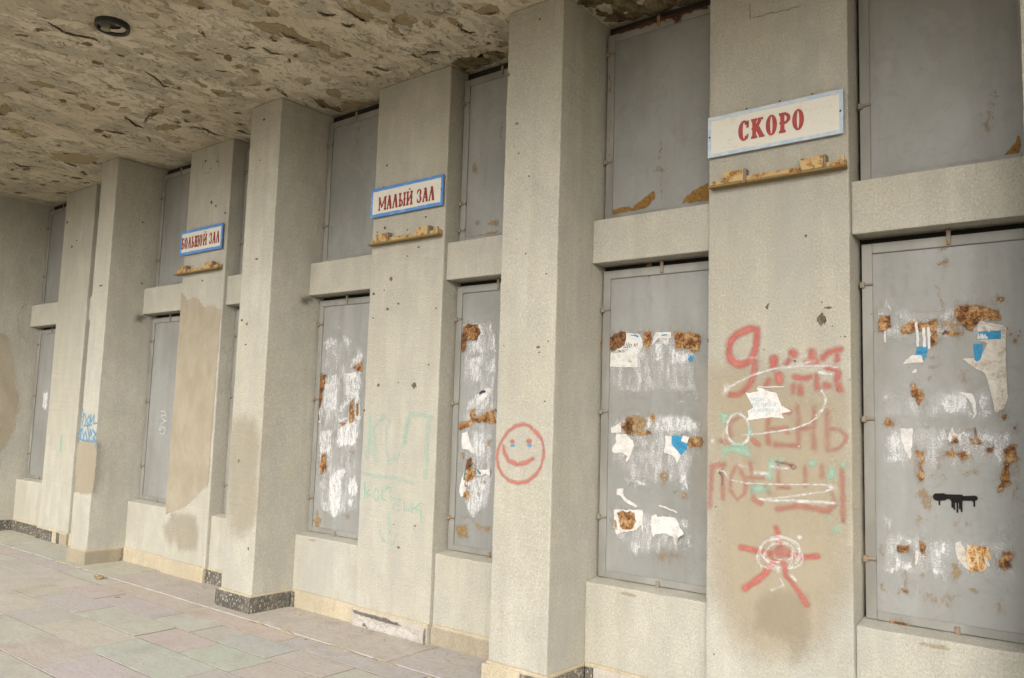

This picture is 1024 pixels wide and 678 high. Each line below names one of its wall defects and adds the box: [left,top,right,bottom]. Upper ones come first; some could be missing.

crack [47,22,100,42]
peeling [161,45,276,97]
peeling [226,0,379,112]
crack [317,12,355,28]
peeling [337,0,460,36]
peeling [411,31,509,72]
crack [105,114,157,141]
peeling [6,140,102,194]
peeling [0,333,21,453]
peeling [166,292,221,514]
water stain [717,379,840,644]
spalling [353,610,425,644]